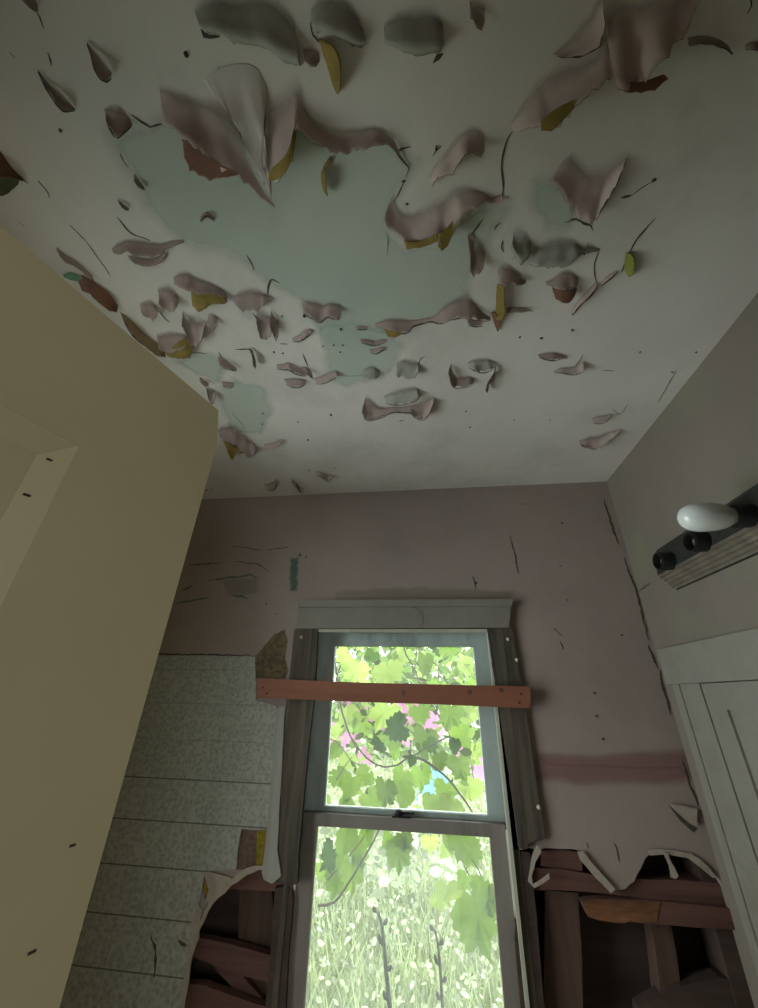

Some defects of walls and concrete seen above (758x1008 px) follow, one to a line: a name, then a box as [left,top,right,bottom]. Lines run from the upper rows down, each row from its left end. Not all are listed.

peeling [104,0,733,251]
peeling [112,200,184,267]
peeling [57,248,343,388]
peeling [362,356,434,421]
peeling [448,360,496,393]
peeling [538,353,584,375]
crack [604,500,671,715]
crack [682,760,699,806]
spalling [528,846,550,888]
spalling [577,851,615,893]
spalling [647,849,716,879]
spalling [179,865,263,1008]